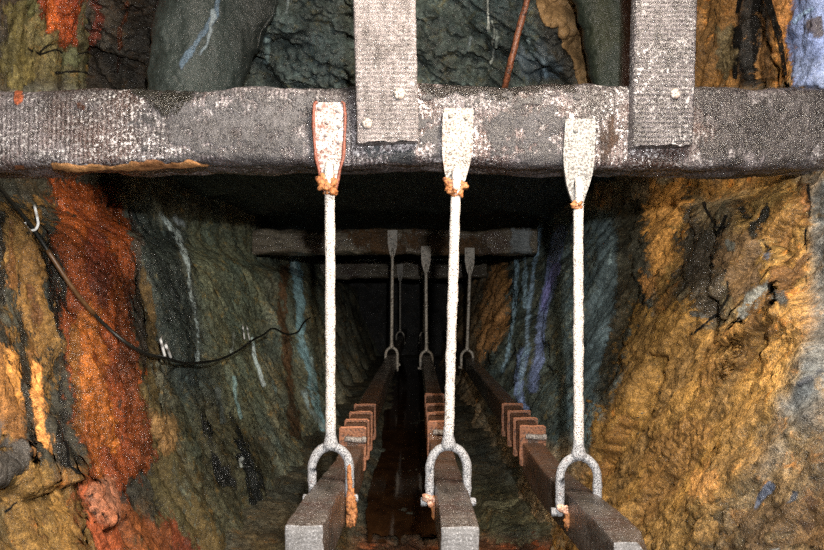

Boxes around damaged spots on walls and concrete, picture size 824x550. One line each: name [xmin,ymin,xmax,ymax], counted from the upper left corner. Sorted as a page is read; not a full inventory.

corrosion [36,0,106,51]
corrosion [14,90,24,105]
corrosion [312,101,347,197]
corrosion [442,177,469,198]
corrosion [346,464,358,528]
corrosion [422,494,436,521]
corrosion [556,504,570,531]